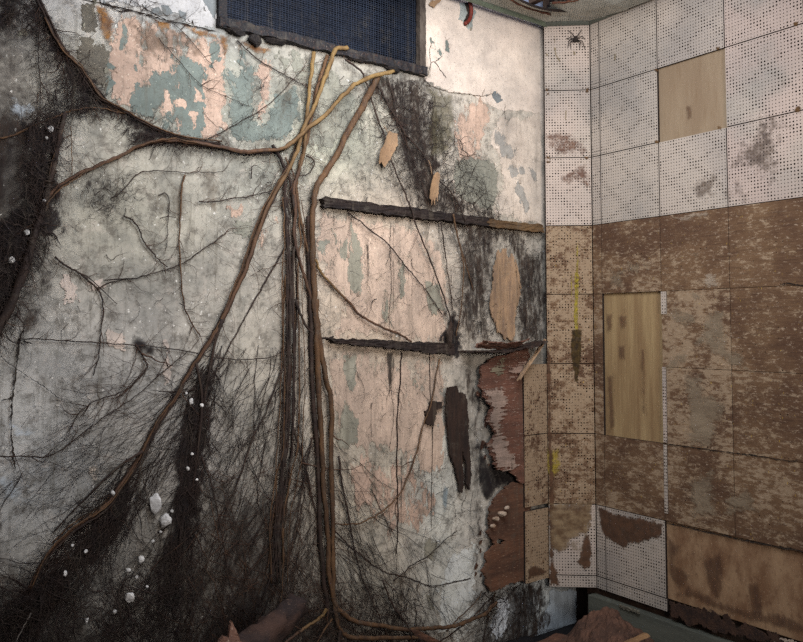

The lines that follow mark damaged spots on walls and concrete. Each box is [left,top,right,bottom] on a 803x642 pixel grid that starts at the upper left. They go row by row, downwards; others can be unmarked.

peeling [77,0,358,152]
water stain [365,74,491,217]
peeling [424,0,545,230]
water stain [548,134,585,152]
mould [743,117,776,167]
water stain [439,226,546,358]
water stain [571,246,582,382]
water stain [153,353,218,572]
water stain [466,369,518,499]
water stain [507,352,663,640]